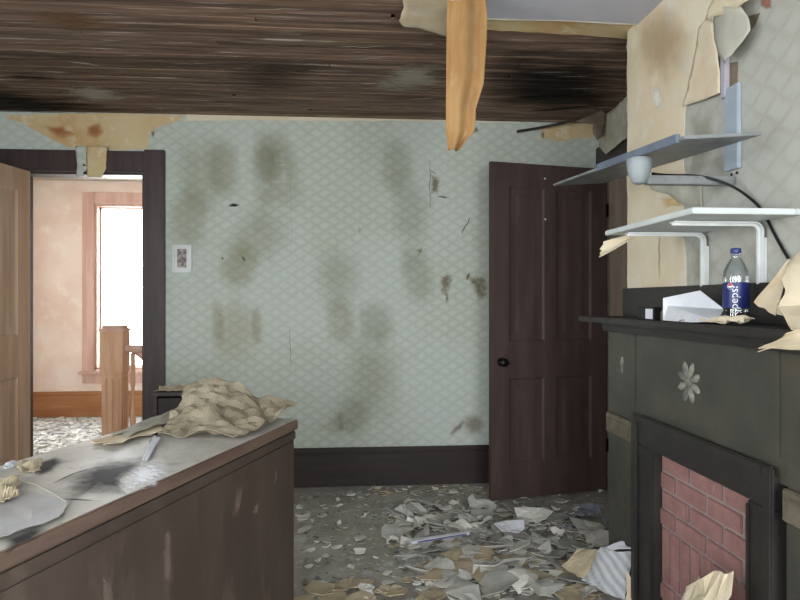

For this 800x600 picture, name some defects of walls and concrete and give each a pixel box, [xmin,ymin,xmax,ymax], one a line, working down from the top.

peeling [6,0,520,178]
damp [499,53,605,111]
peeling [541,0,760,154]
peeling [650,159,685,175]
peeling [627,176,702,225]
peeling [627,236,687,288]